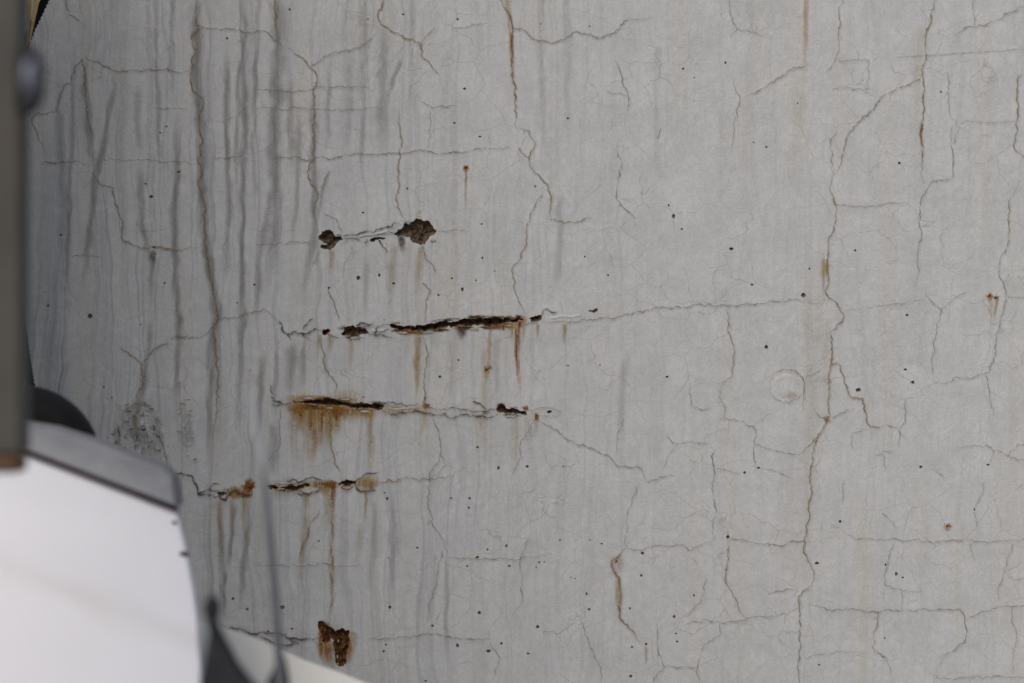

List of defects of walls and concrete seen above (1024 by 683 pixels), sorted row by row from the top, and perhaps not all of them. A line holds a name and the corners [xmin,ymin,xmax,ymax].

crack [31,0,651,424]
spalling [318,229,343,250]
spalling [370,218,436,245]
spalling [322,325,368,339]
corrosion [394,315,524,370]
spalling [390,314,542,334]
crack [515,0,1024,683]
corrosion [292,396,381,434]
crack [355,245,542,680]
crack [178,472,250,501]
corrosion [227,480,255,498]
corrosion [313,478,375,506]